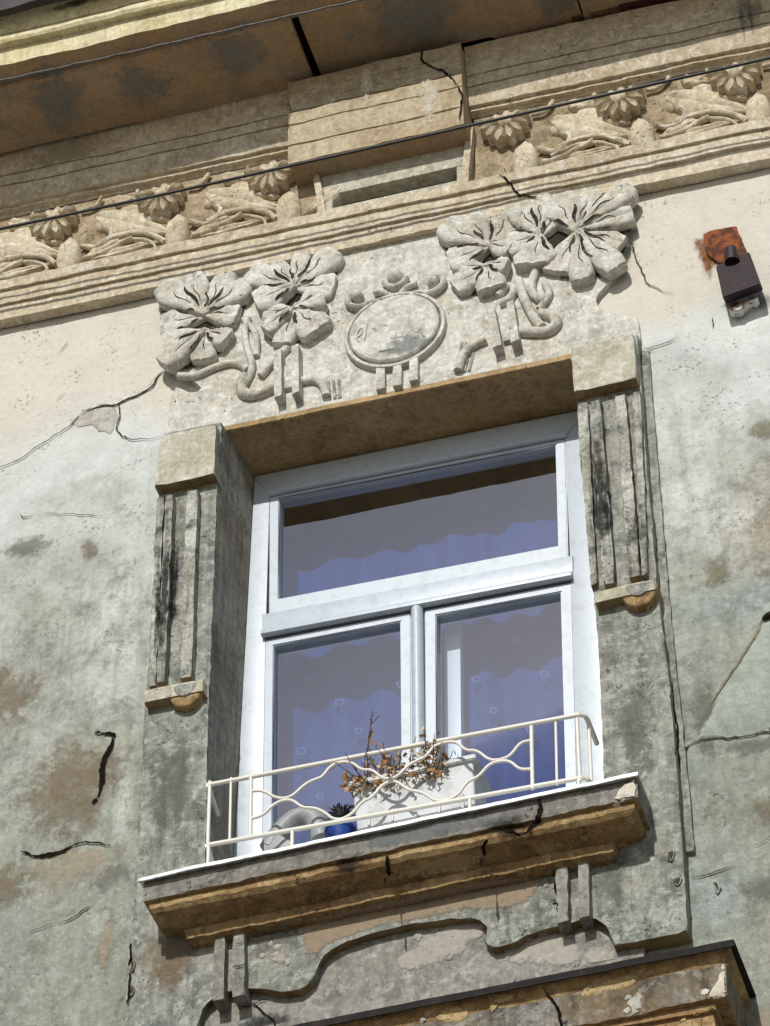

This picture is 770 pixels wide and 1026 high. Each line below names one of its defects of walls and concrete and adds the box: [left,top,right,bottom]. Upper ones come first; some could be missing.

rust [695,239,714,271]
crack [0,370,166,467]
leakage [154,548,178,647]
crack [669,679,770,768]
crack [92,732,116,804]
crack [20,841,111,858]
crack [479,798,543,866]
peeling [296,869,549,969]
peeling [420,1006,468,1024]
peeling [502,933,645,1015]
peeling [678,1012,700,1026]
peeling [701,963,729,999]